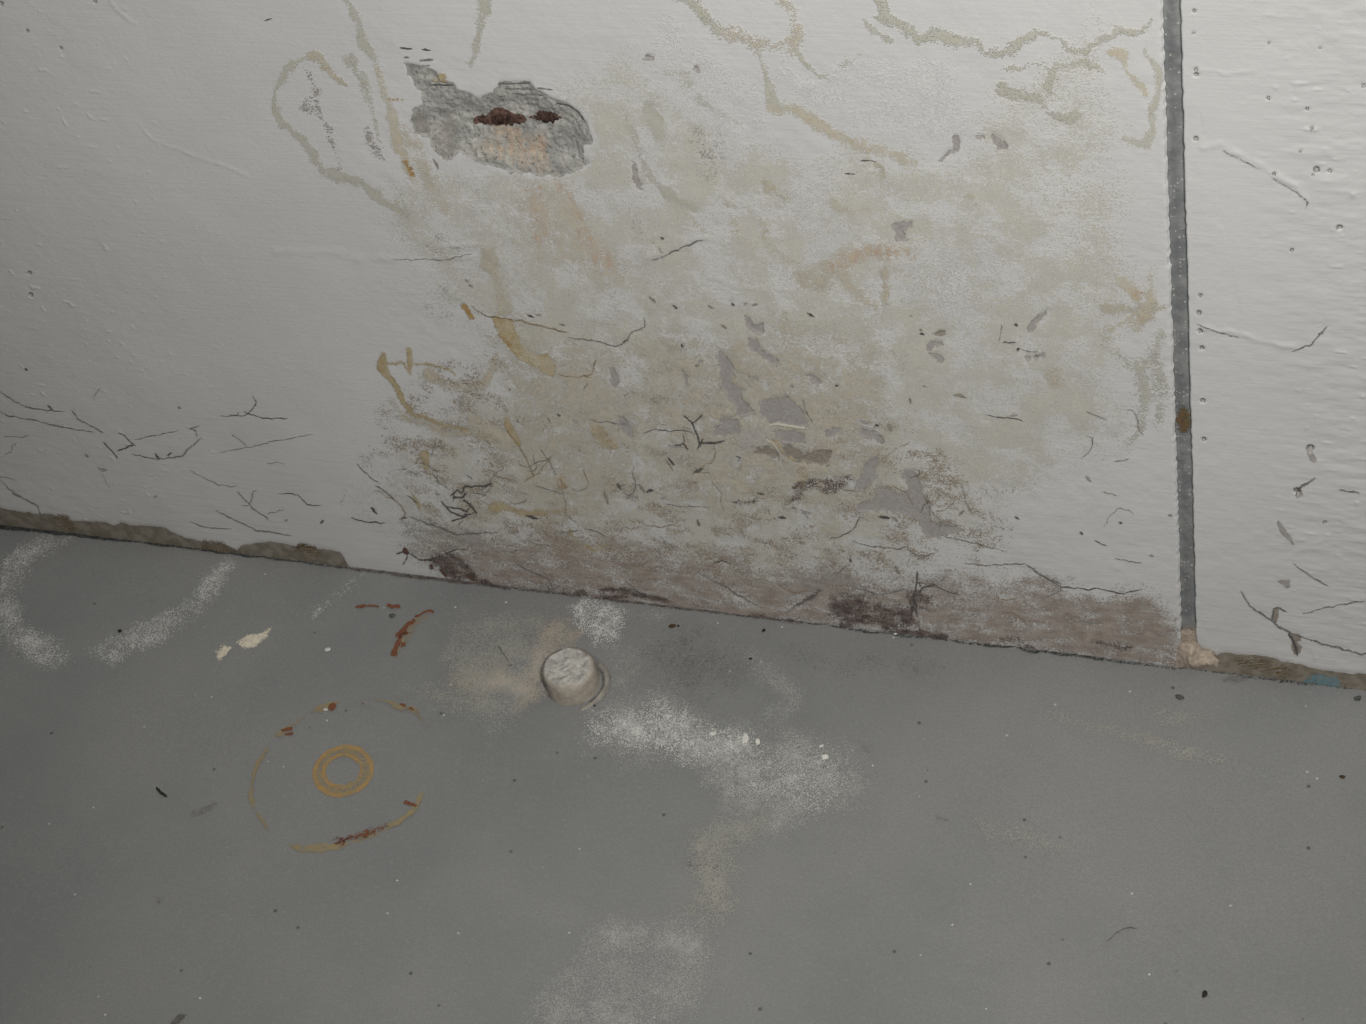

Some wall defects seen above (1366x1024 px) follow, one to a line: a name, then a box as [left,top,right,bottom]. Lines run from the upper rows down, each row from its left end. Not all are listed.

spalling [400,47,593,177]
peeling [0,508,348,567]
crack [0,390,605,589]
damp [271,0,1179,1024]
crack [472,306,1143,624]
crack [1296,478,1358,496]
rust [355,603,434,659]
crack [1242,563,1366,656]
rust [248,700,341,829]
rust [312,744,374,798]
rust [289,792,425,854]